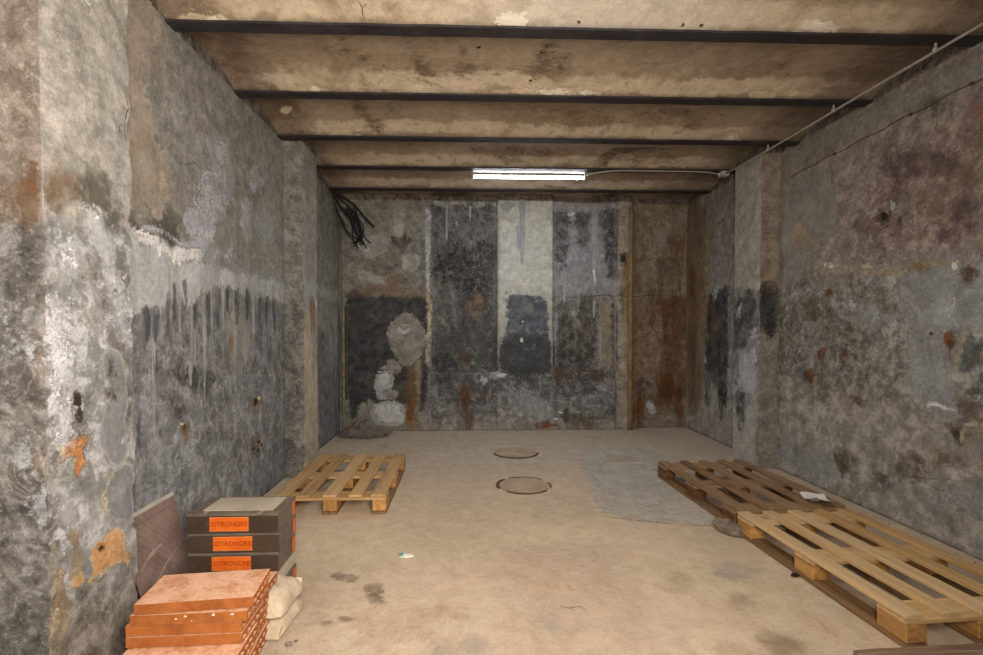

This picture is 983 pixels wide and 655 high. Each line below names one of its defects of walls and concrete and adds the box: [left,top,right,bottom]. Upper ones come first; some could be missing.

water stain [48,134,275,274]
water stain [2,292,89,459]
water stain [174,308,254,427]
peeling [378,359,402,386]
water stain [12,436,37,476]
water stain [24,484,79,568]
peeling [48,348,134,655]
water stain [167,427,201,484]